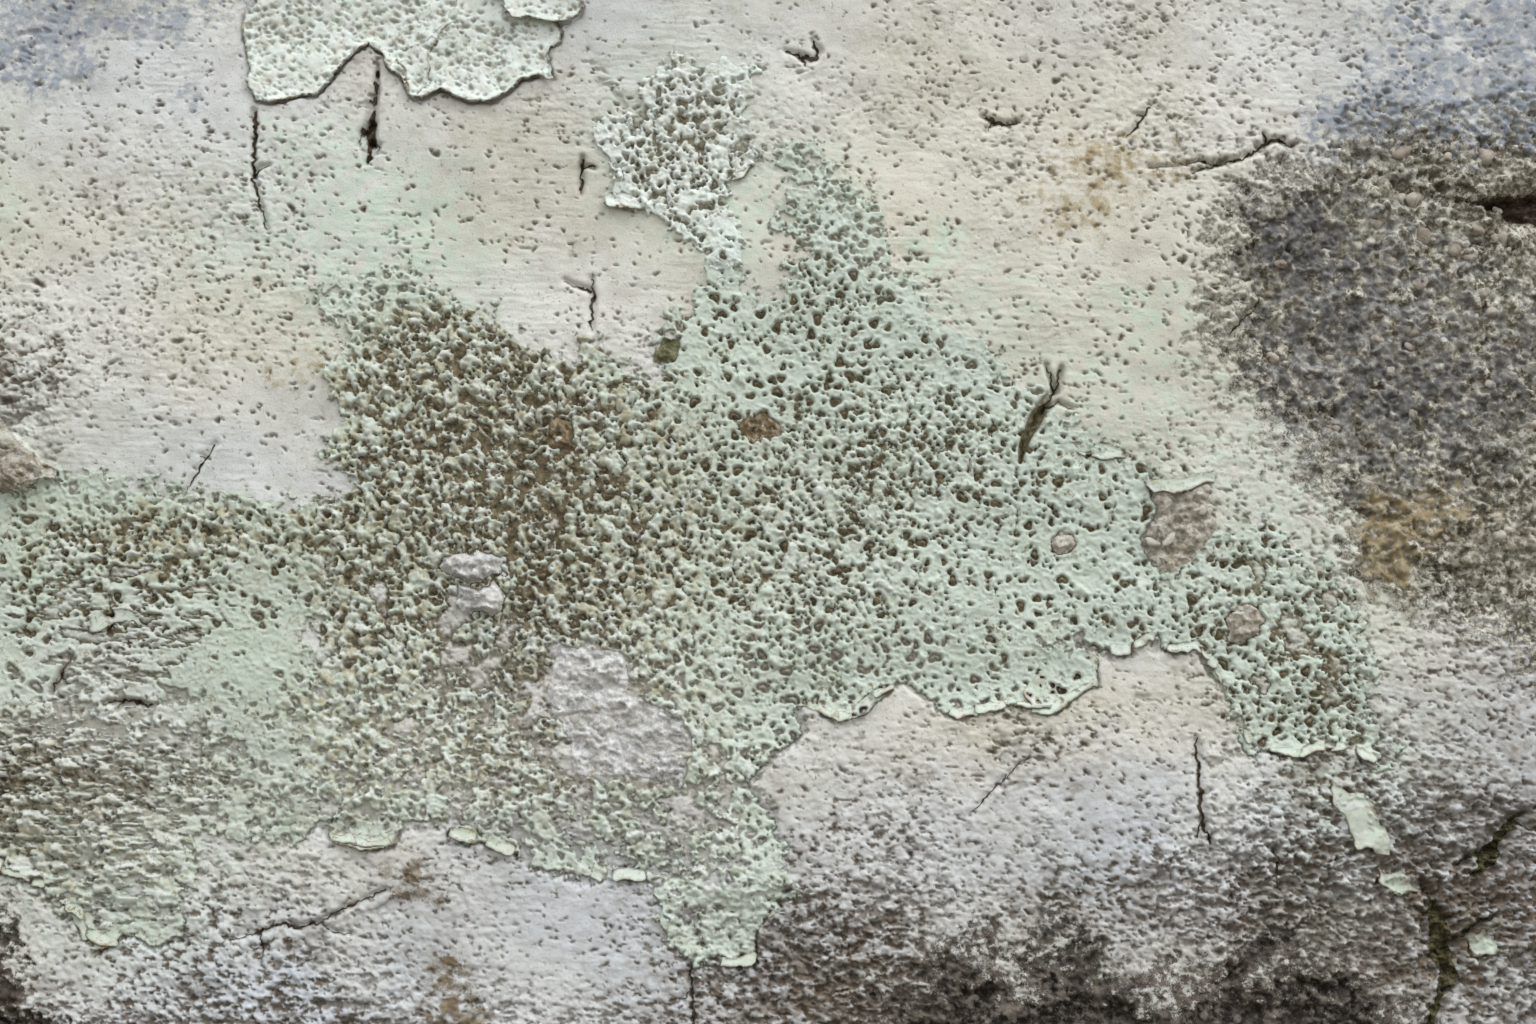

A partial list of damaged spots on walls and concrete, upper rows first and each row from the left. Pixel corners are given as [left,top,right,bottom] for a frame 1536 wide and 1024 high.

peeling [241,0,584,103]
crack [251,111,269,230]
crack [359,71,380,163]
crack [1019,367,1071,463]
spalling [1187,94,1536,694]
peeling [289,50,1405,969]
peeling [0,464,329,951]
crack [1455,806,1536,877]
leakage [1037,909,1155,1002]
flaking render [801,878,1482,1024]
leakage [1233,924,1296,964]
crack [1420,883,1496,1024]